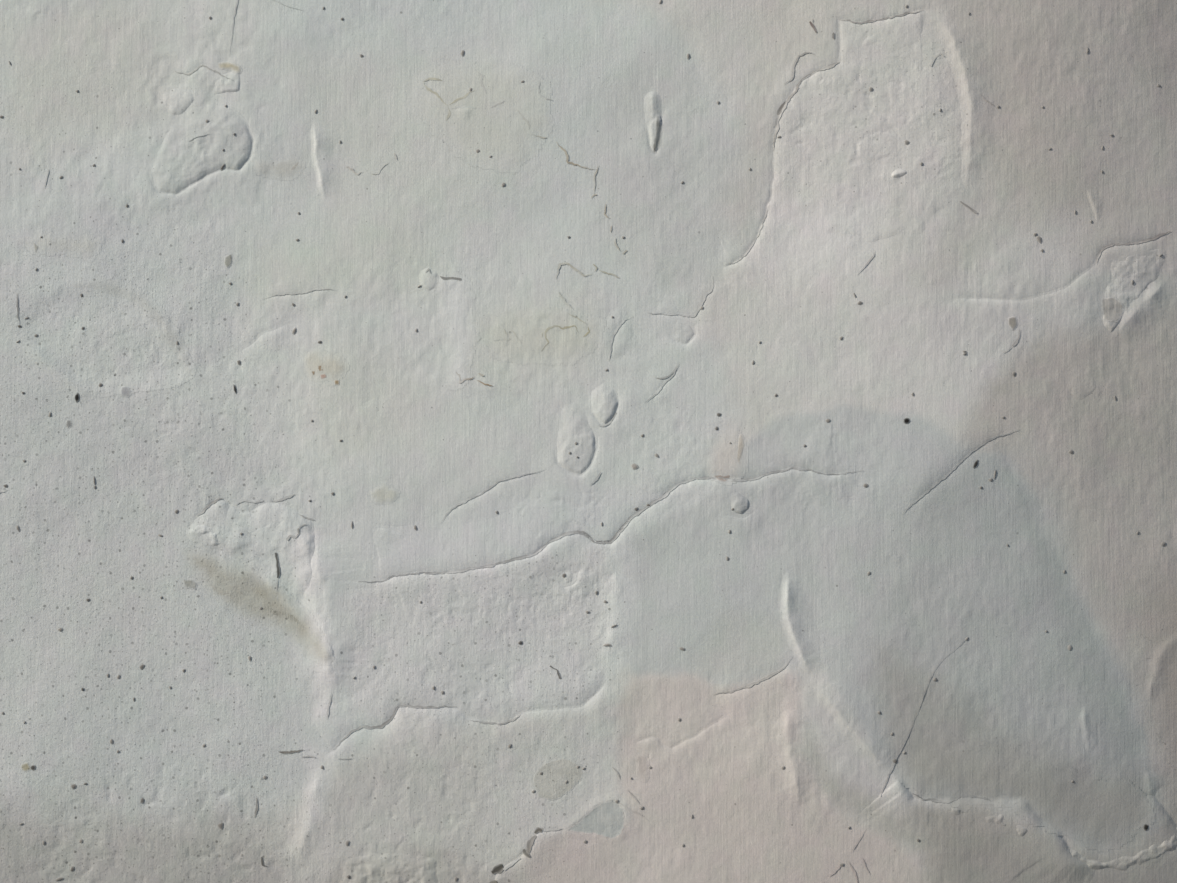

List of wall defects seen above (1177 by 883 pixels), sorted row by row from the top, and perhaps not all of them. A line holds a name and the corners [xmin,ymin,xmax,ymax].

flaking render [185,476,329,536]
crack [849,773,1100,883]
leakage [895,730,1156,852]